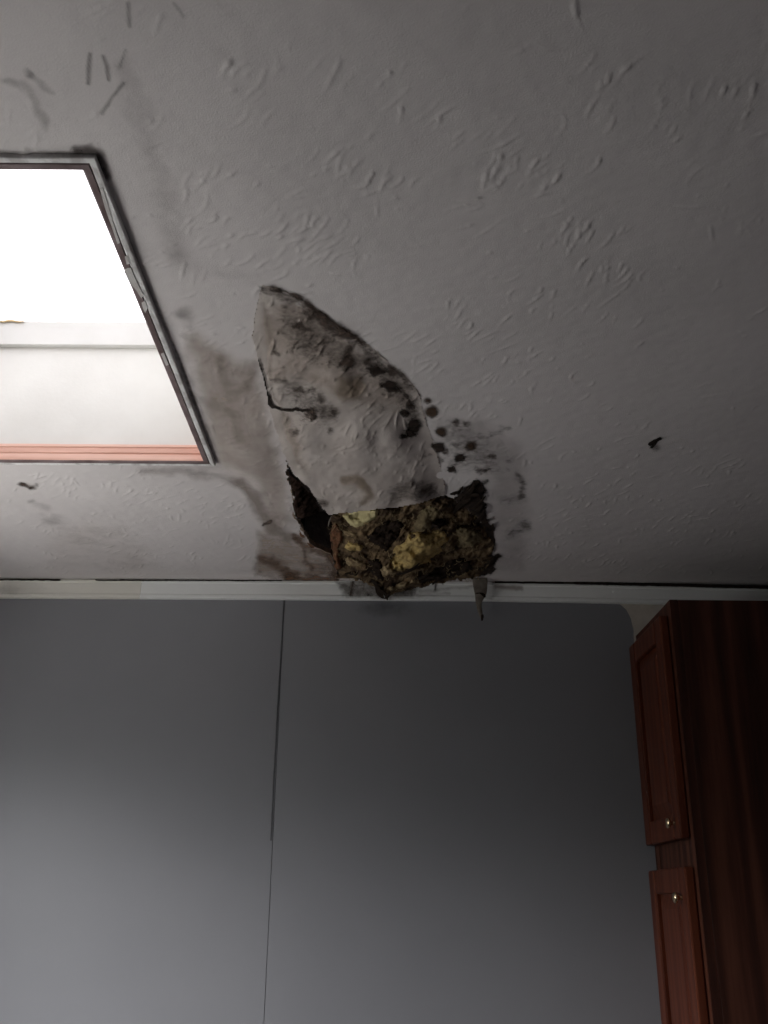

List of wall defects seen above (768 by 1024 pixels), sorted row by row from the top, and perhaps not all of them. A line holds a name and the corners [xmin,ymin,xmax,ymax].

crack [258,359,311,412]
damp [270,286,475,472]
peeling [441,484,494,531]
damp [454,455,502,577]